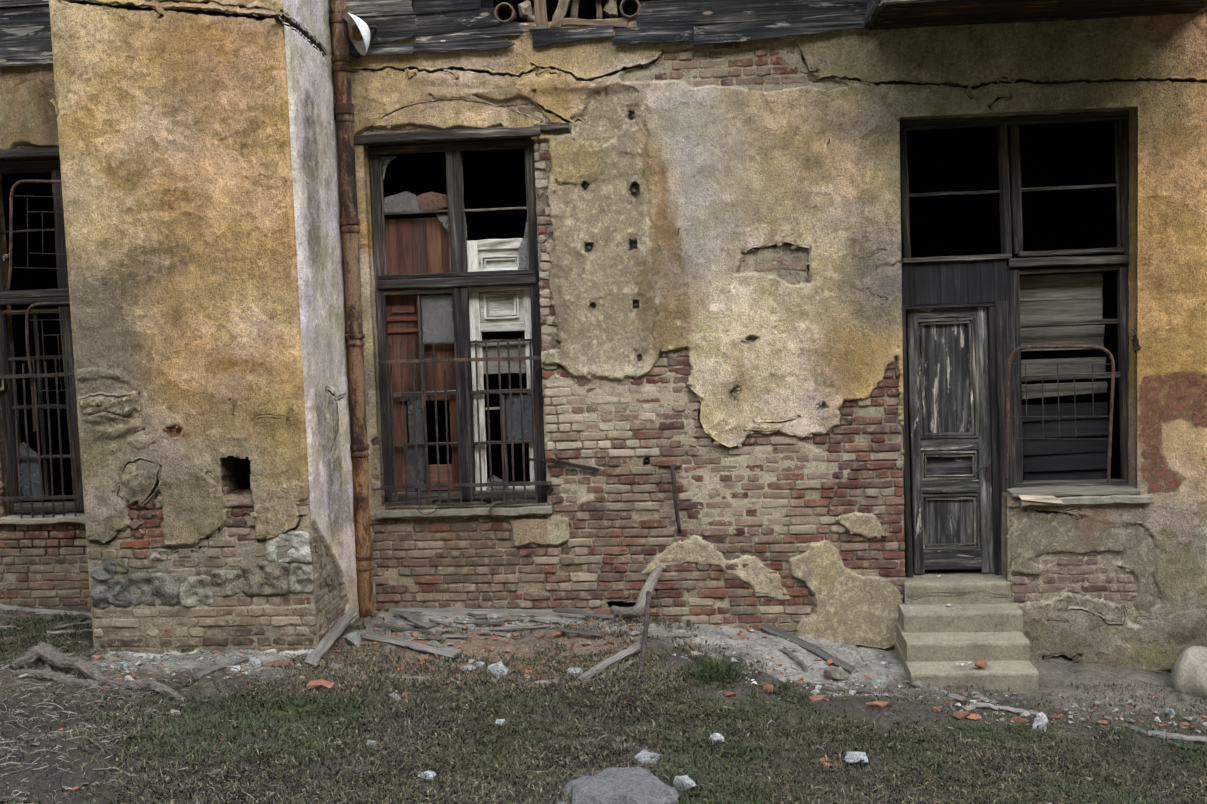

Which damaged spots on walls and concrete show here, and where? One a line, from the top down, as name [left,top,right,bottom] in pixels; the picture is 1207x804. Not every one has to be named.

crack [61,0,663,133]
crack [794,40,1207,107]
spalling [365,38,905,635]
flaking render [79,394,141,438]
spalling [163,426,182,438]
spalling [0,439,347,659]
flaking render [1005,506,1162,622]